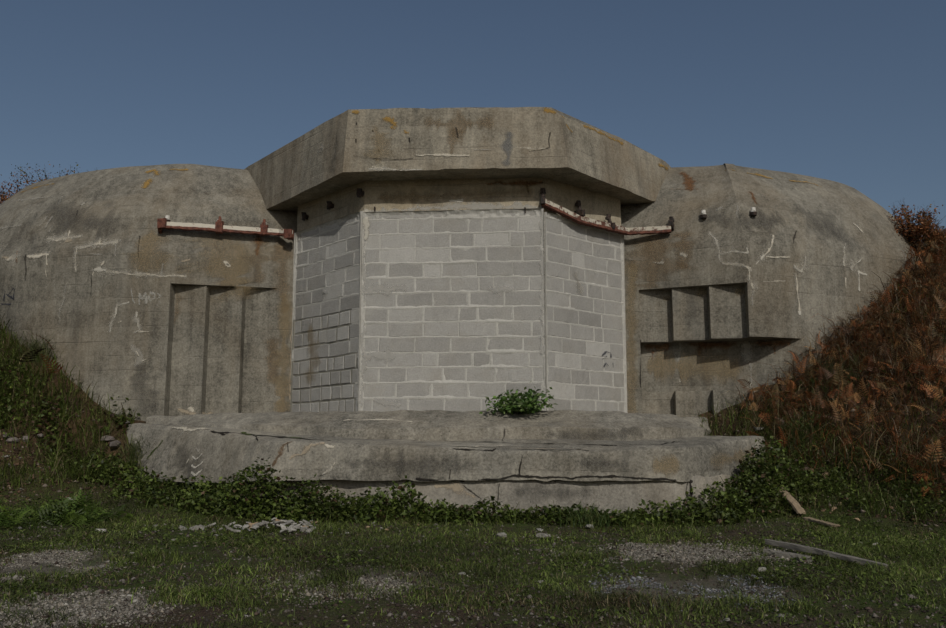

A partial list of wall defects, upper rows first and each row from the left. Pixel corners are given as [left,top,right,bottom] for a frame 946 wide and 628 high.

crack [416,430,693,499]